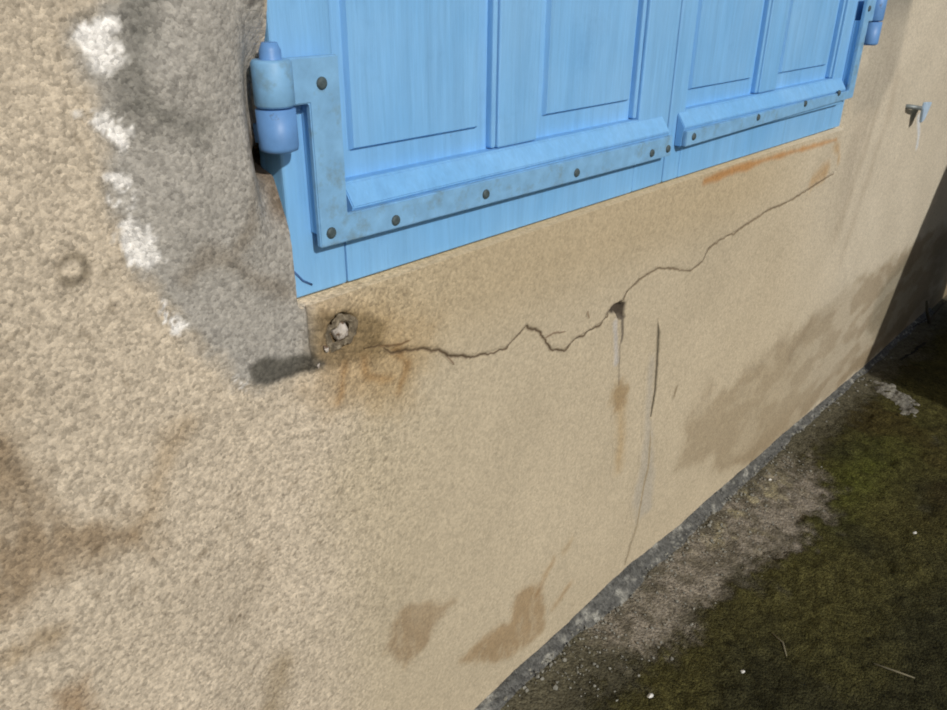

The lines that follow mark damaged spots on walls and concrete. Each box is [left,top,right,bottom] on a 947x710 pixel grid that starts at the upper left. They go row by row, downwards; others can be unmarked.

corrosion [700,131,842,199]
water stain [825,22,904,273]
water stain [914,110,922,153]
corrosion [283,278,454,445]
crack [364,170,836,365]
flaking render [604,297,628,321]
water stain [605,312,658,527]
crack [624,323,661,565]
water stain [671,154,947,477]
water stain [379,593,460,675]
water stain [456,529,578,670]